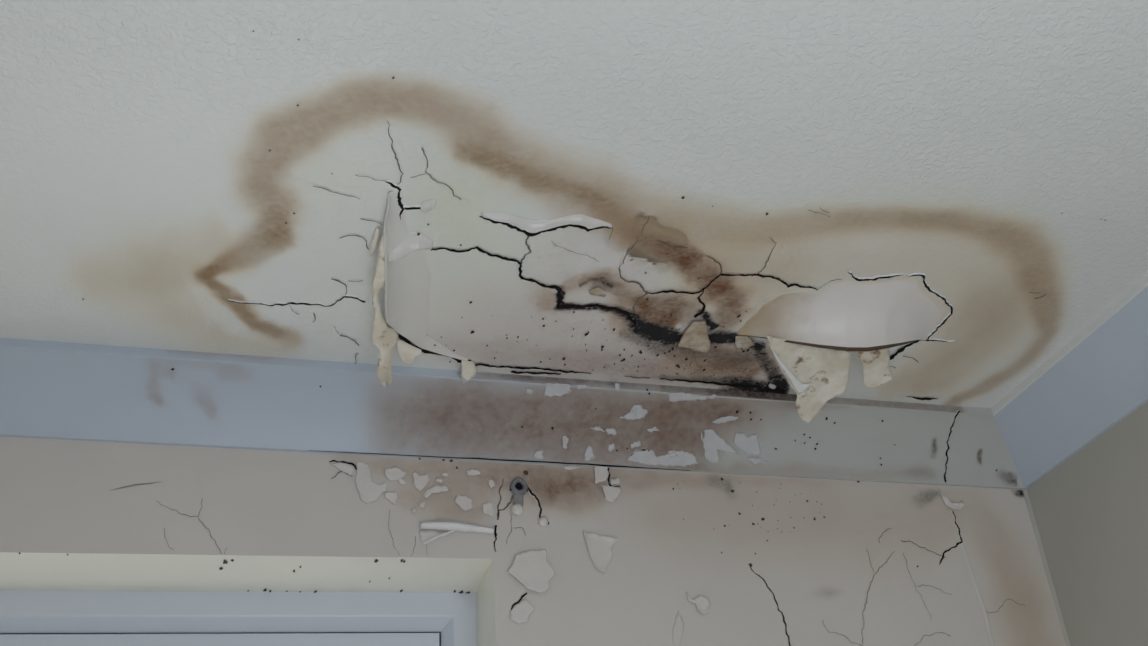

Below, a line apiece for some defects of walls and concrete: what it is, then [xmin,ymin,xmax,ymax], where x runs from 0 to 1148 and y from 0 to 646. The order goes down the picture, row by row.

crack [314,121,955,368]
crack [228,279,366,364]
peeling [329,461,495,545]
crack [398,334,591,375]
peeling [525,383,590,398]
water stain [49,57,1091,541]
peeling [563,446,622,502]
peeling [590,405,768,467]
peeling [668,392,717,402]
crack [906,396,960,482]
crack [747,564,791,646]
crack [823,511,963,646]